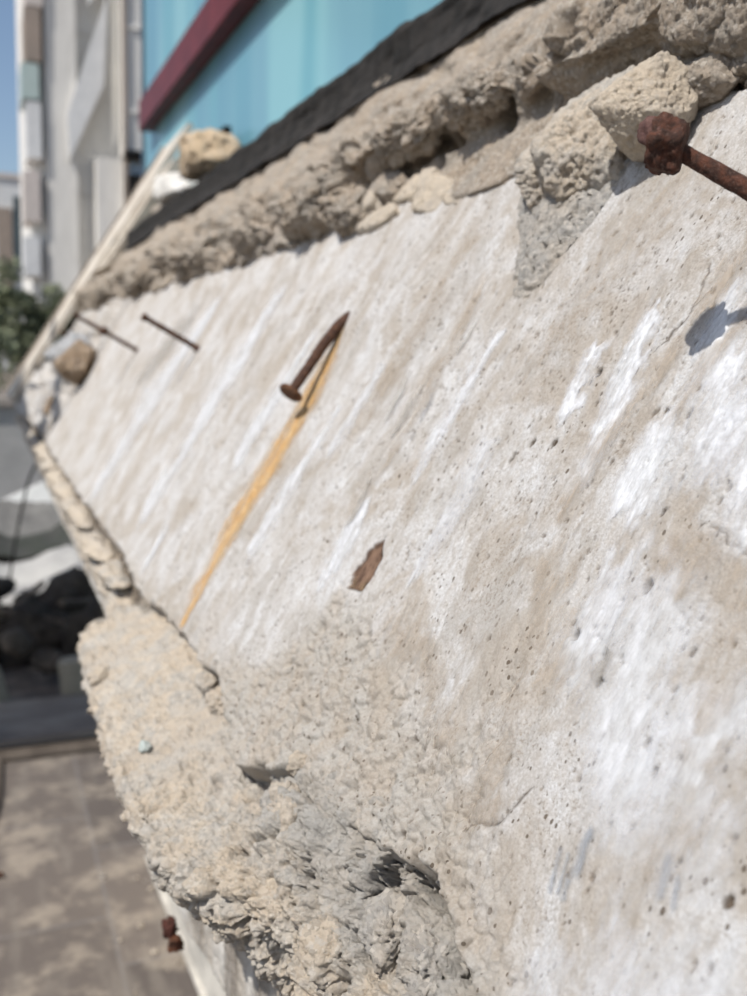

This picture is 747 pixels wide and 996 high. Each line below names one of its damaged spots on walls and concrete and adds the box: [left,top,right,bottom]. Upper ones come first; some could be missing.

spalling [73,0,747,313]
spalling [15,414,478,996]
rust [181,333,341,626]
rust [348,540,385,591]